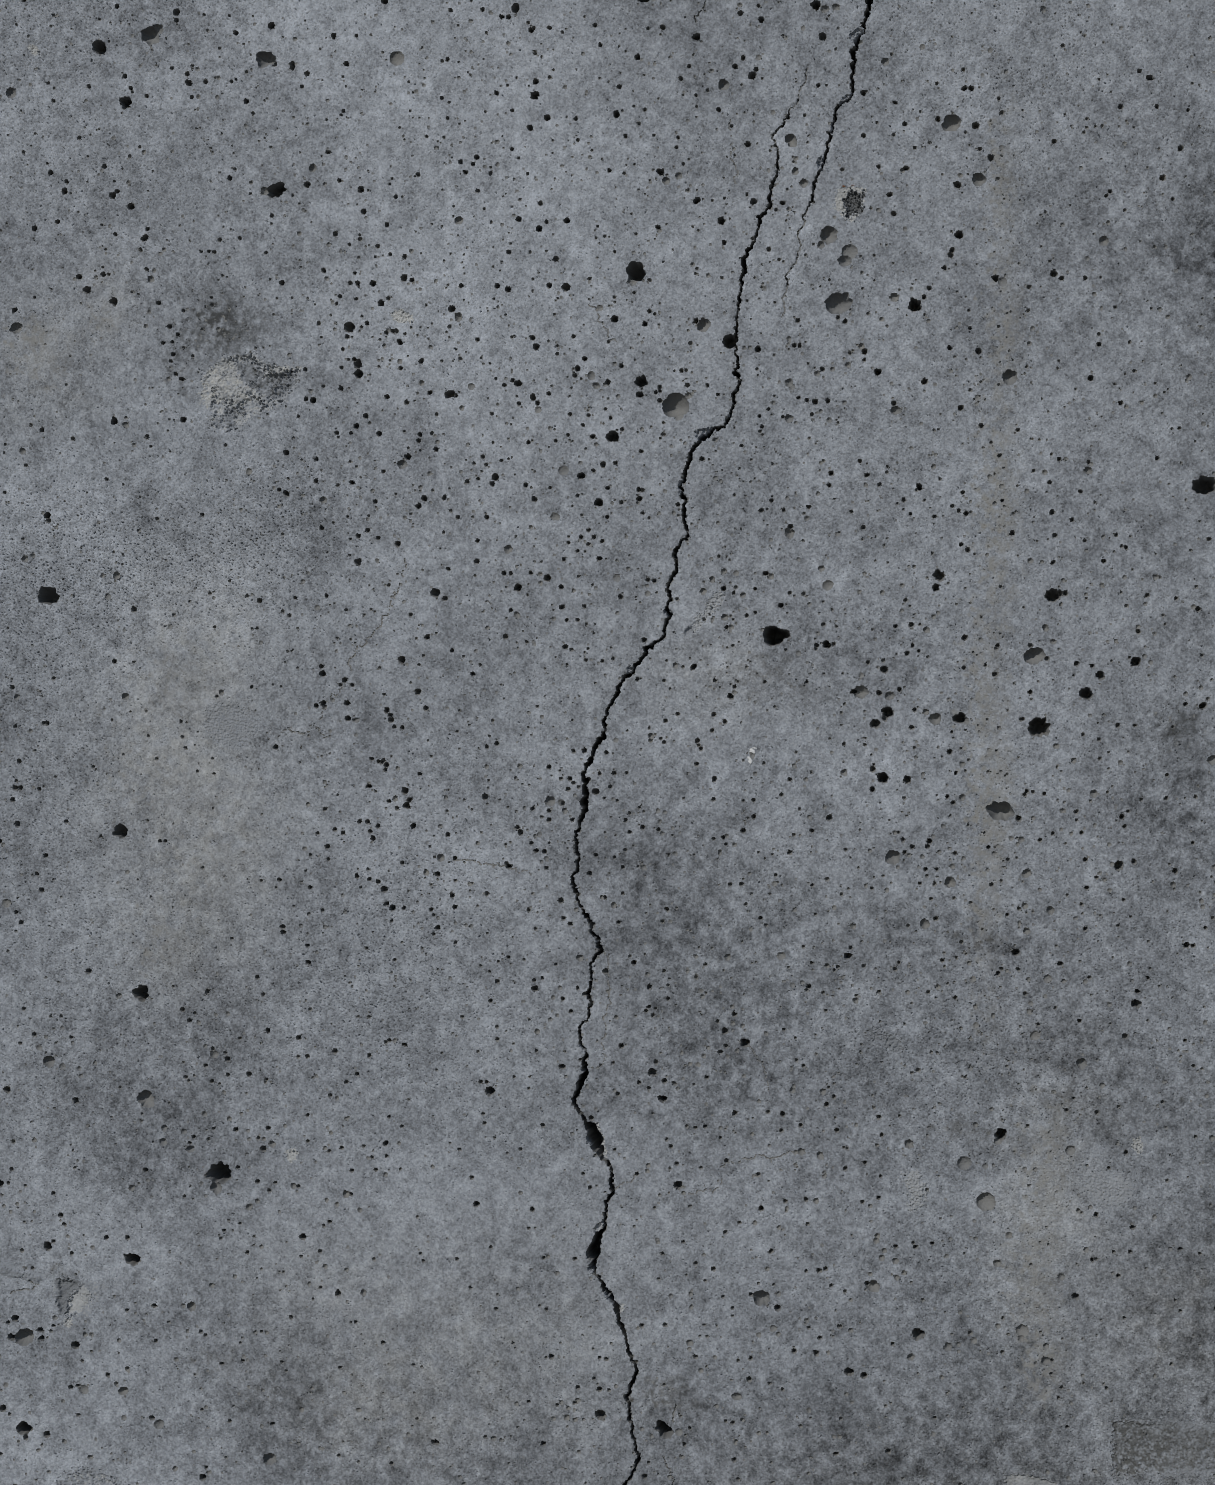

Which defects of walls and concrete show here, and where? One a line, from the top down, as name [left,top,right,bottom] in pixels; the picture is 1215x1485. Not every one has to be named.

crack [456,859,532,876]
crack [570,0,873,1485]